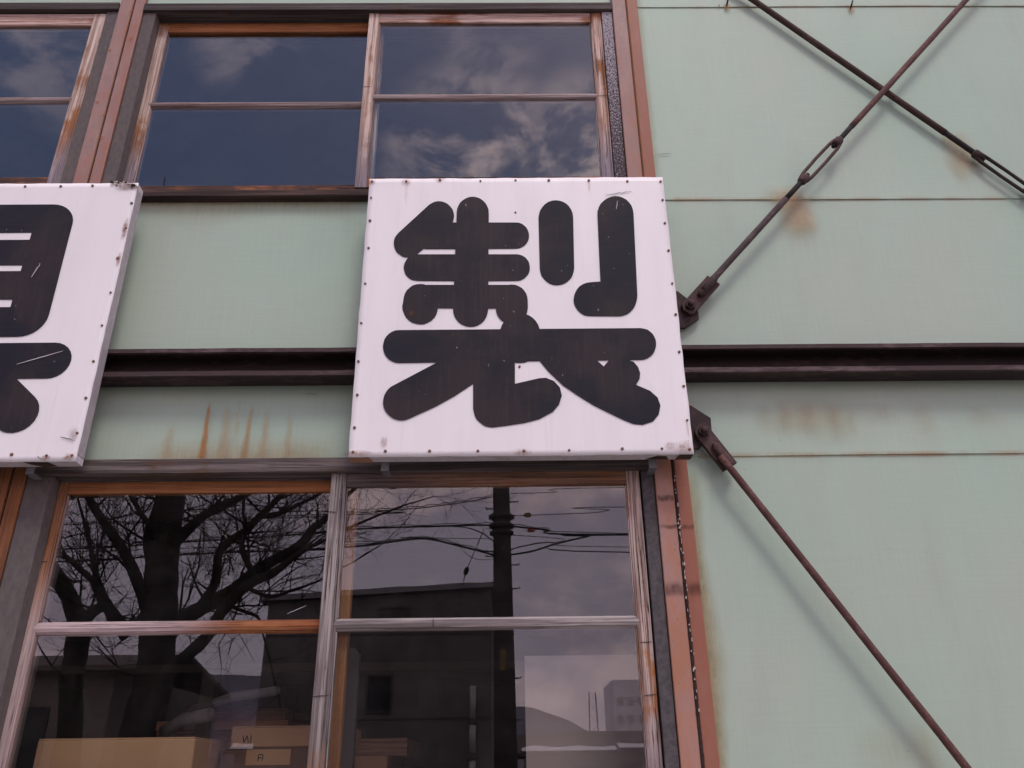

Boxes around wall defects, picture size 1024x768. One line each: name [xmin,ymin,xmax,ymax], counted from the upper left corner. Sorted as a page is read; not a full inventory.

rust [200,408,210,457]